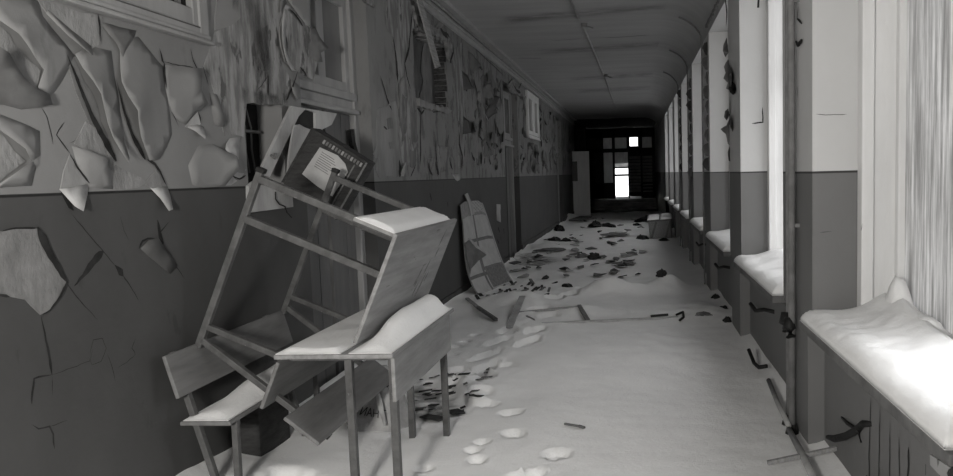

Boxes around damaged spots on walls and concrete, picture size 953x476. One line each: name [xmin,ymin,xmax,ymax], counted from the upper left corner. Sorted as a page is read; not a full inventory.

peeling [0,0,329,211]
peeling [372,0,454,179]
peeling [474,66,504,170]
peeling [520,94,558,174]
peeling [677,42,709,177]
peeling [721,109,733,161]
peeling [723,38,736,95]
flaking render [0,227,68,315]
crack [31,217,139,449]